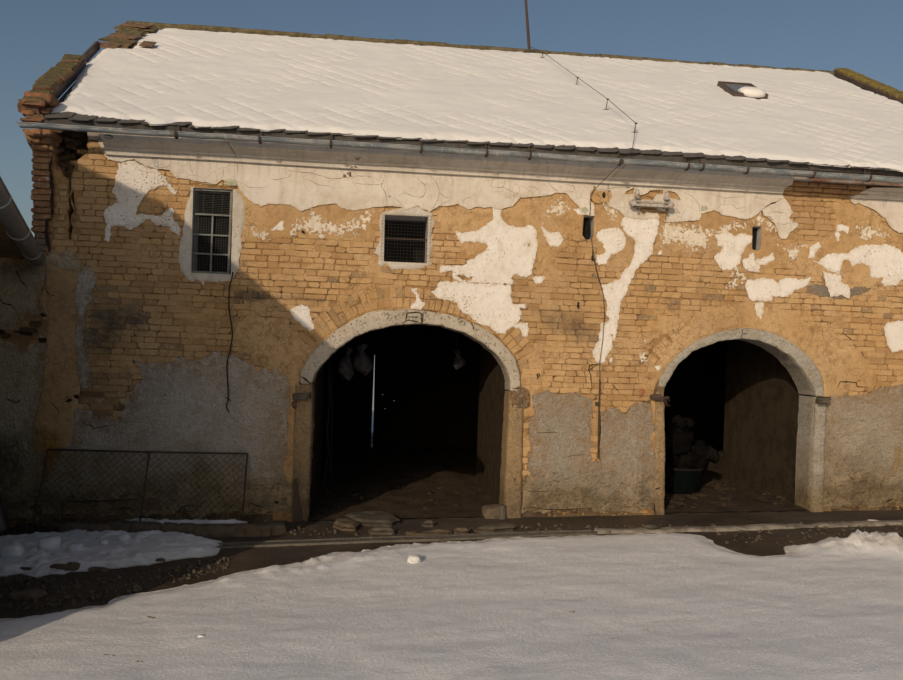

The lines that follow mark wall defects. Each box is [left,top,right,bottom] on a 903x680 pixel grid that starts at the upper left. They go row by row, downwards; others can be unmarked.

crack [34,129,113,252]
flaking render [103,161,182,242]
crack [127,141,471,212]
flaking render [251,208,375,241]
crack [686,193,788,225]
flaking render [75,266,97,389]
flaking render [290,305,314,331]
flaking render [410,288,425,310]
flaking render [431,196,583,337]
flaking render [590,187,903,363]
spalling [510,387,530,408]
spalling [636,335,665,395]